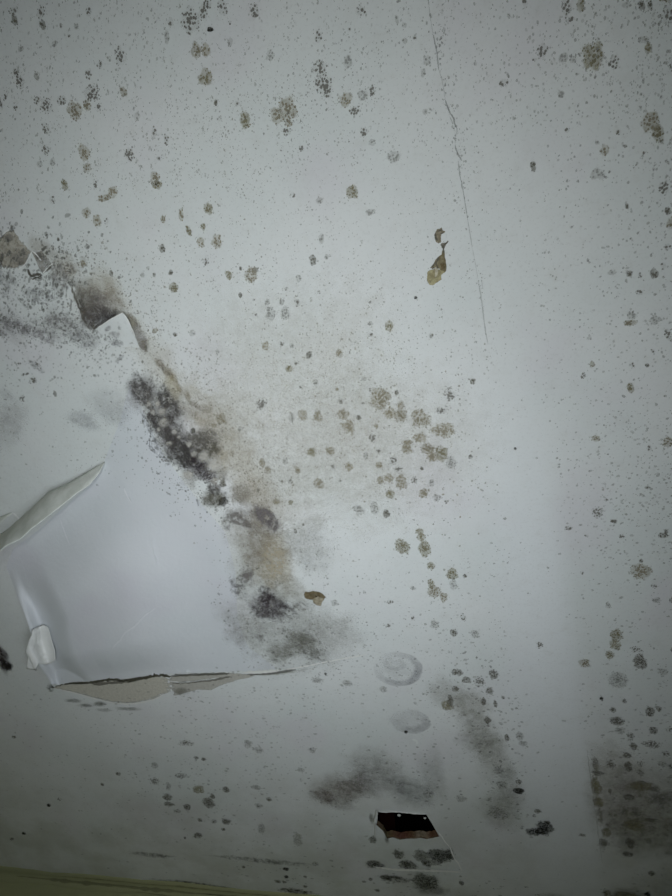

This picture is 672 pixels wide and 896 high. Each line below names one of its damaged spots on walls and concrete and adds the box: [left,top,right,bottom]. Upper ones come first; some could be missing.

damp [582,43,619,71]
peeling [0,229,53,280]
peeling [70,282,146,350]
peeling [0,462,105,551]
damp [129,374,293,596]
mould [0,648,11,671]
spalling [373,810,435,832]